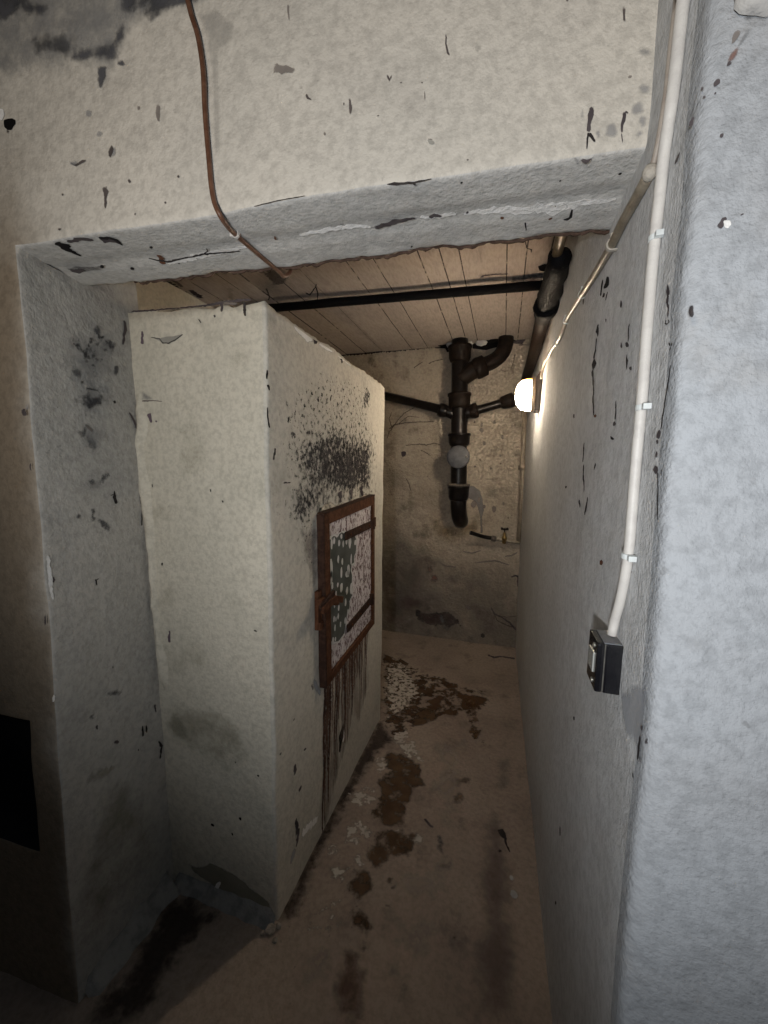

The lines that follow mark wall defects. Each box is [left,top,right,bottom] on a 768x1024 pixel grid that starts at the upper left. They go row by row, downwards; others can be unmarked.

water stain [0,0,185,87]
water stain [73,326,114,375]
corrosion [322,633,368,833]
water stain [349,753,425,898]